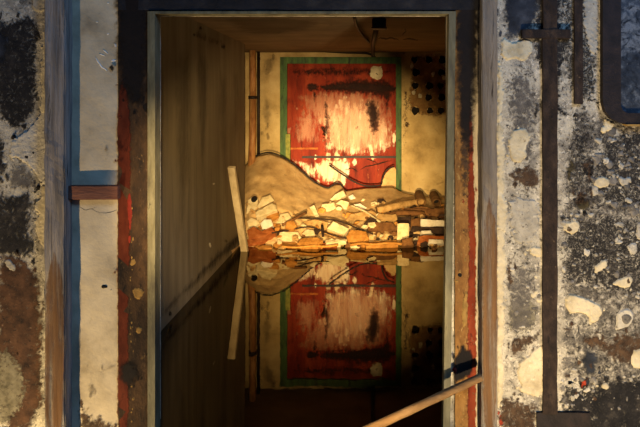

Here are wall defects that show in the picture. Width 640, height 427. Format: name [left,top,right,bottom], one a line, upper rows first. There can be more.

damp [0,12,42,130]
peeling [102,84,144,427]
spalling [247,226,288,247]
peeling [295,99,396,185]
peeling [381,167,396,189]
corrosion [460,130,471,198]
peeling [497,37,543,408]
damp [506,39,542,165]
damp [557,0,574,116]
peeling [560,118,640,325]
peeling [558,355,617,411]
peeling [616,349,640,401]